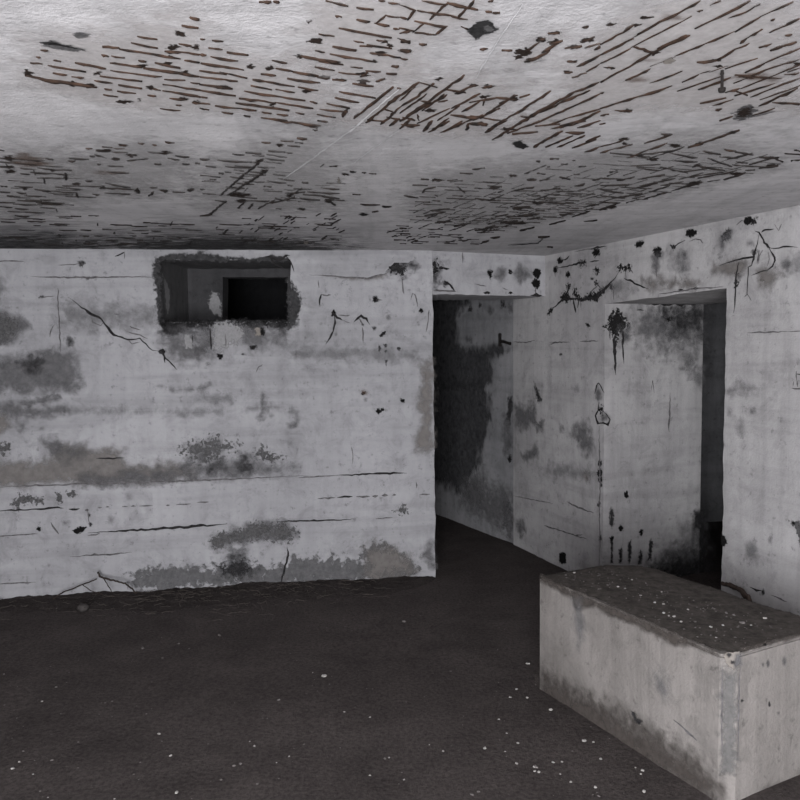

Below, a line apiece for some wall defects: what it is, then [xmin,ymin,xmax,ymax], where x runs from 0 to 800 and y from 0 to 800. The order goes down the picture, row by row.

spalling [0,0,800,248]
corrosion [730,104,775,121]
crack [0,252,177,370]
spalling [184,292,244,352]
crack [477,225,798,316]
leakage [0,349,80,433]
leakage [416,299,525,538]
leakage [0,442,194,487]
crack [0,502,223,557]
leakage [126,540,436,590]